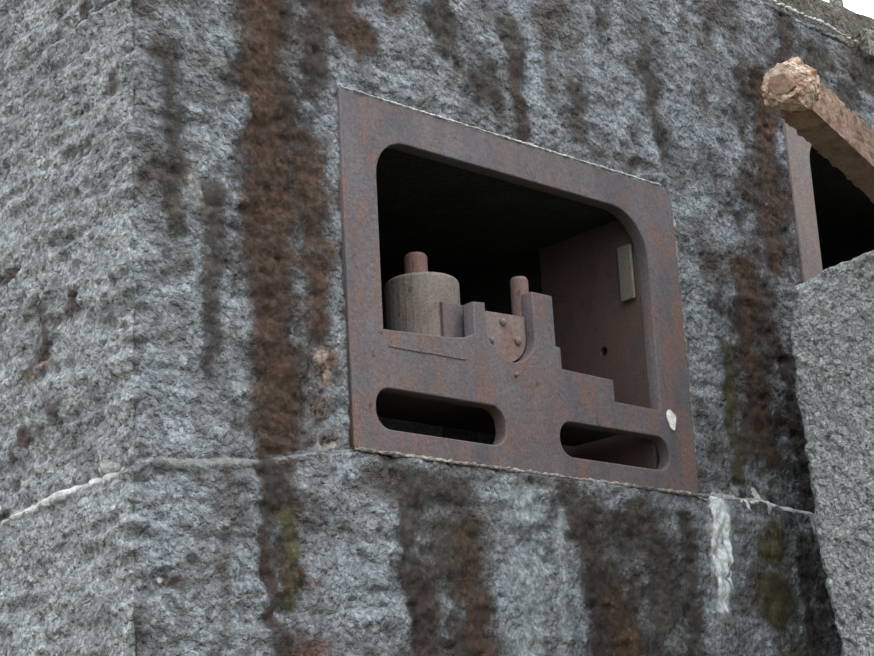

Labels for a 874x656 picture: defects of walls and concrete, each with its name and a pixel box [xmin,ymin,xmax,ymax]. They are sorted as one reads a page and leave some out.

water stain [159,39,186,231]
corrosion [379,0,399,17]
water stain [422,0,456,58]
water stain [466,14,531,145]
water stain [639,46,669,161]
water stain [200,182,227,377]
corrosion [228,0,379,656]
crack [0,462,124,524]
water stain [391,466,498,656]
water stain [507,482,706,656]
water stain [710,492,734,613]
water stain [757,514,819,656]